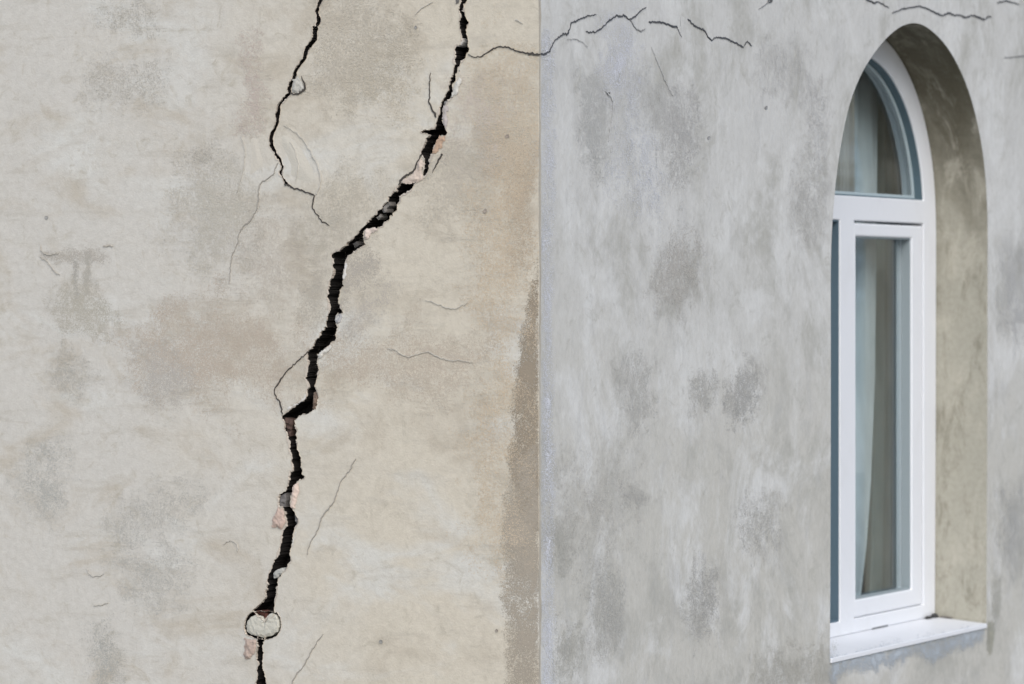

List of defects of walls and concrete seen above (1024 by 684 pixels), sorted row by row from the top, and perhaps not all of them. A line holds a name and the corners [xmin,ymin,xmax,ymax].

crack [229,0,330,281]
crack [245,0,752,684]
leakage [403,29,659,684]
crack [867,0,1019,20]